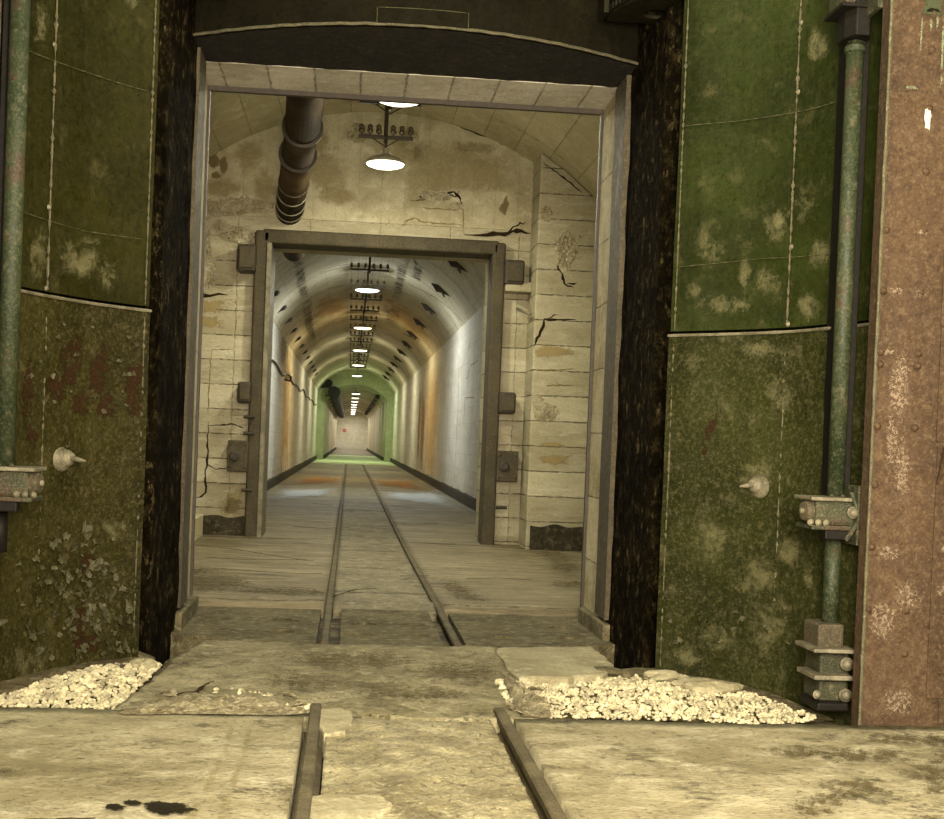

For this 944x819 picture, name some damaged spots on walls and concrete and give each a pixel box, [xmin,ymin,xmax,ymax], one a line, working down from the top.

crack [402,191,530,237]
rust [20,329,144,454]
crack [196,349,243,498]
crack [531,369,571,386]
crack [534,314,576,346]
peeling [16,520,134,671]